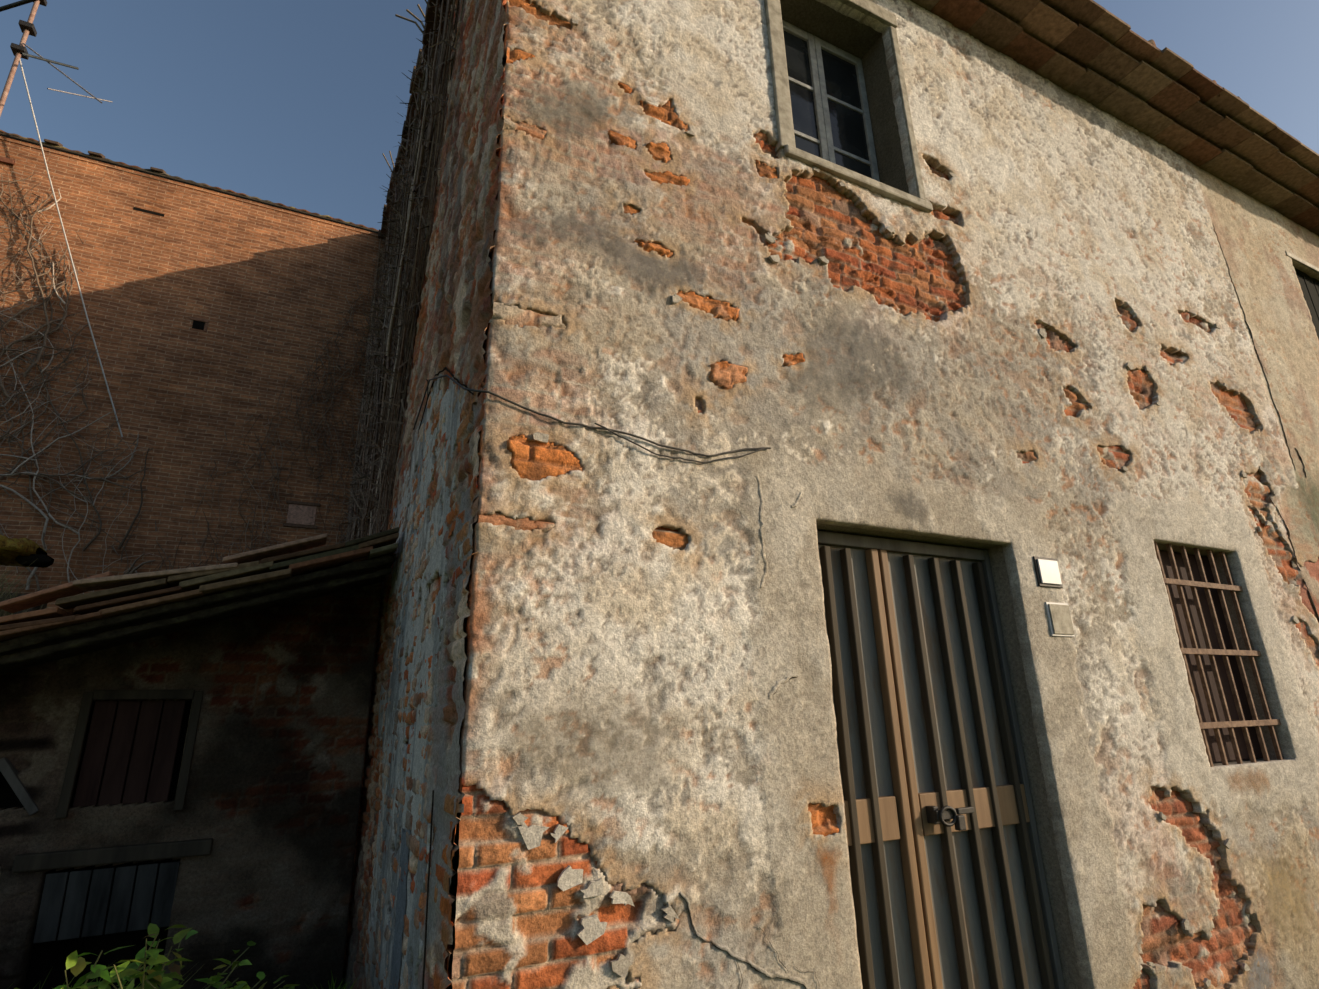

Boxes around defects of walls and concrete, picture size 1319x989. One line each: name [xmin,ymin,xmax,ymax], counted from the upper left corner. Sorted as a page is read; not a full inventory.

flaking render [618,83,695,136]
flaking render [607,130,690,186]
flaking render [634,240,674,258]
flaking render [742,131,966,322]
flaking render [671,291,740,321]
flaking render [708,361,748,390]
flaking render [652,527,688,550]
flaking render [1240,466,1319,666]
flaking render [364,374,680,989]
flaking render [808,803,839,836]
flaking render [1133,786,1257,989]
crack [679,891,819,989]